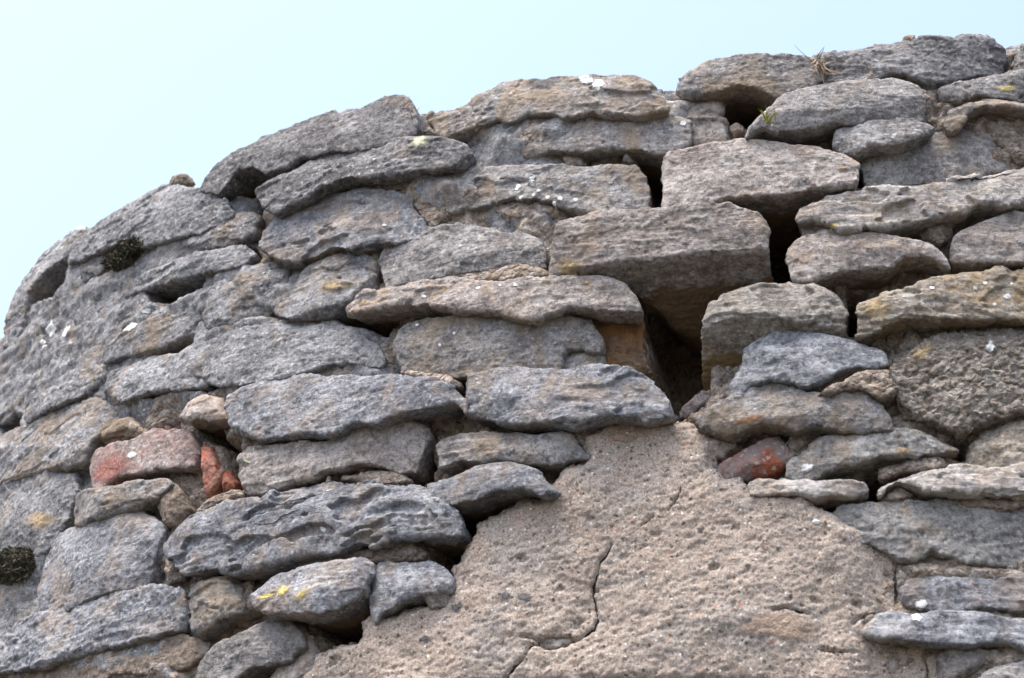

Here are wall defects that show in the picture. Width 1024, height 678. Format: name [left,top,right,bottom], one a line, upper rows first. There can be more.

crack [578,545,612,641]
crack [508,637,540,676]